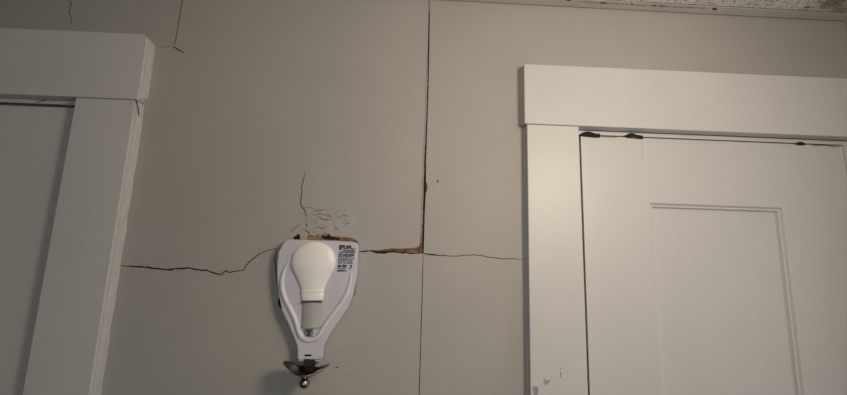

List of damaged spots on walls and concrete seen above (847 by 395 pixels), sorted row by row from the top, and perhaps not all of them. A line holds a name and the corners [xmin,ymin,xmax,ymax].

crack [158,0,184,53]
crack [360,1,514,395]
crack [120,248,279,276]